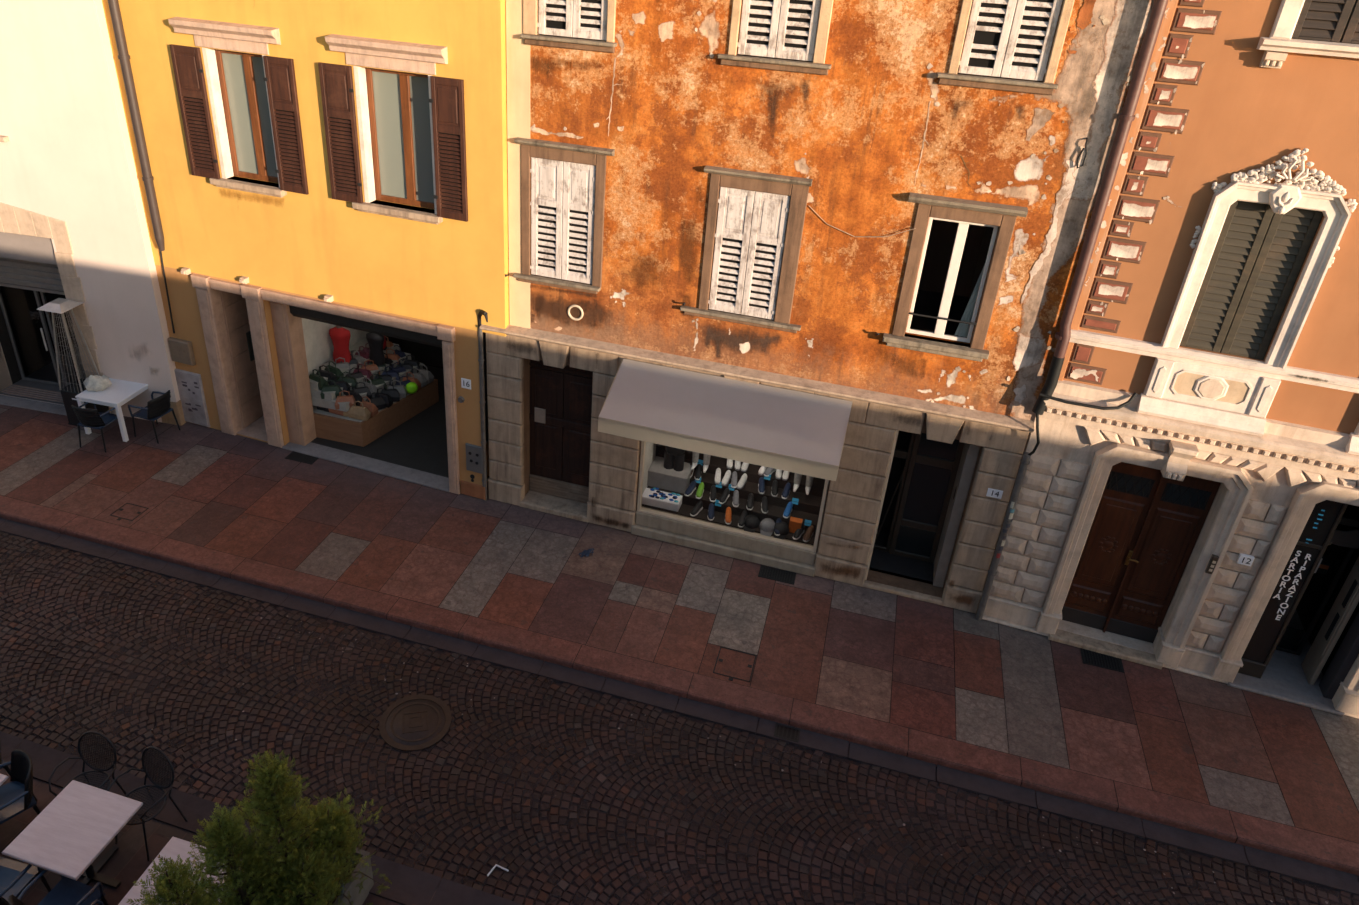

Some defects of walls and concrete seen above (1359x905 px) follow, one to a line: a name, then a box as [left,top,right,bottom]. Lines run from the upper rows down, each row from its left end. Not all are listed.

flaking render [615,11,675,58]
flaking render [695,0,720,58]
flaking render [926,63,941,107]
flaking render [975,0,1217,421]
flaking render [917,366,988,410]